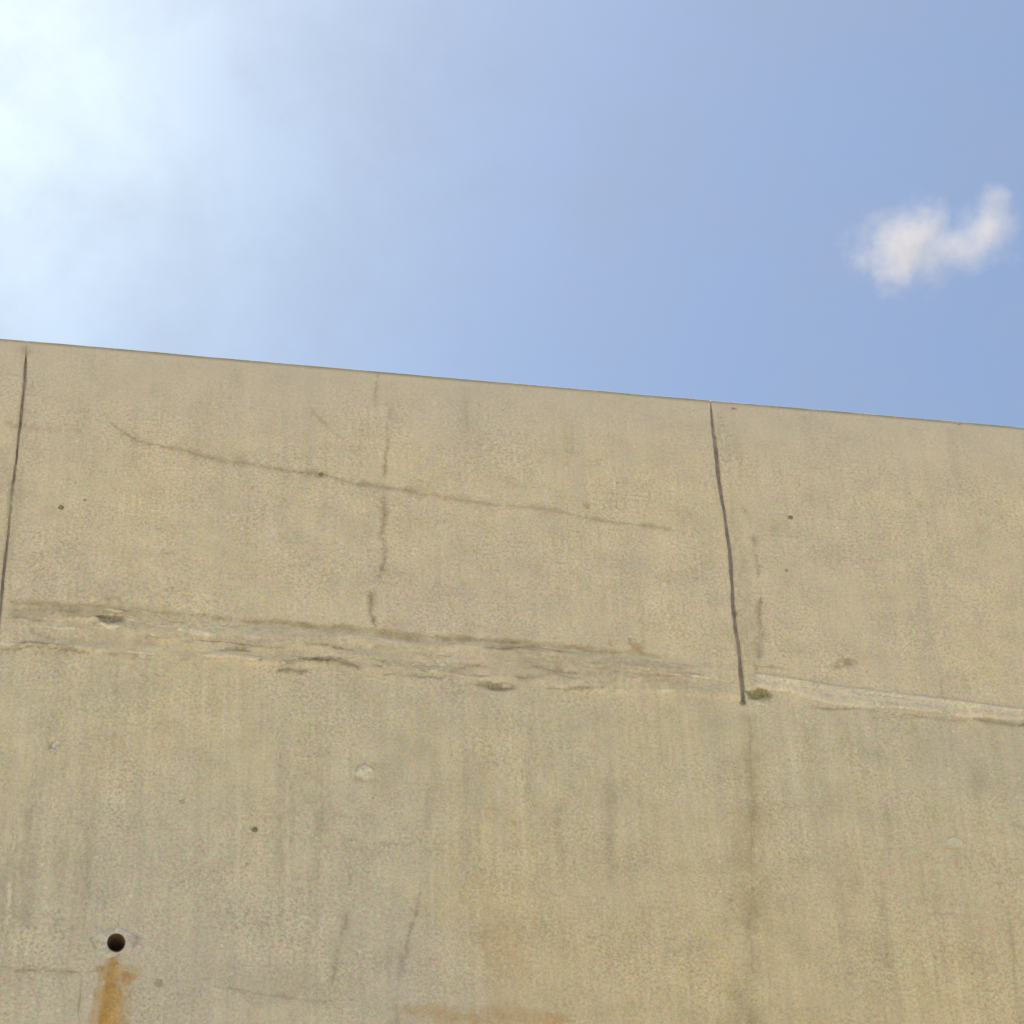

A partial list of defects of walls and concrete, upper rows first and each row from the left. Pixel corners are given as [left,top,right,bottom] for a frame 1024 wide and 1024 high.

rust [99,963,122,1024]